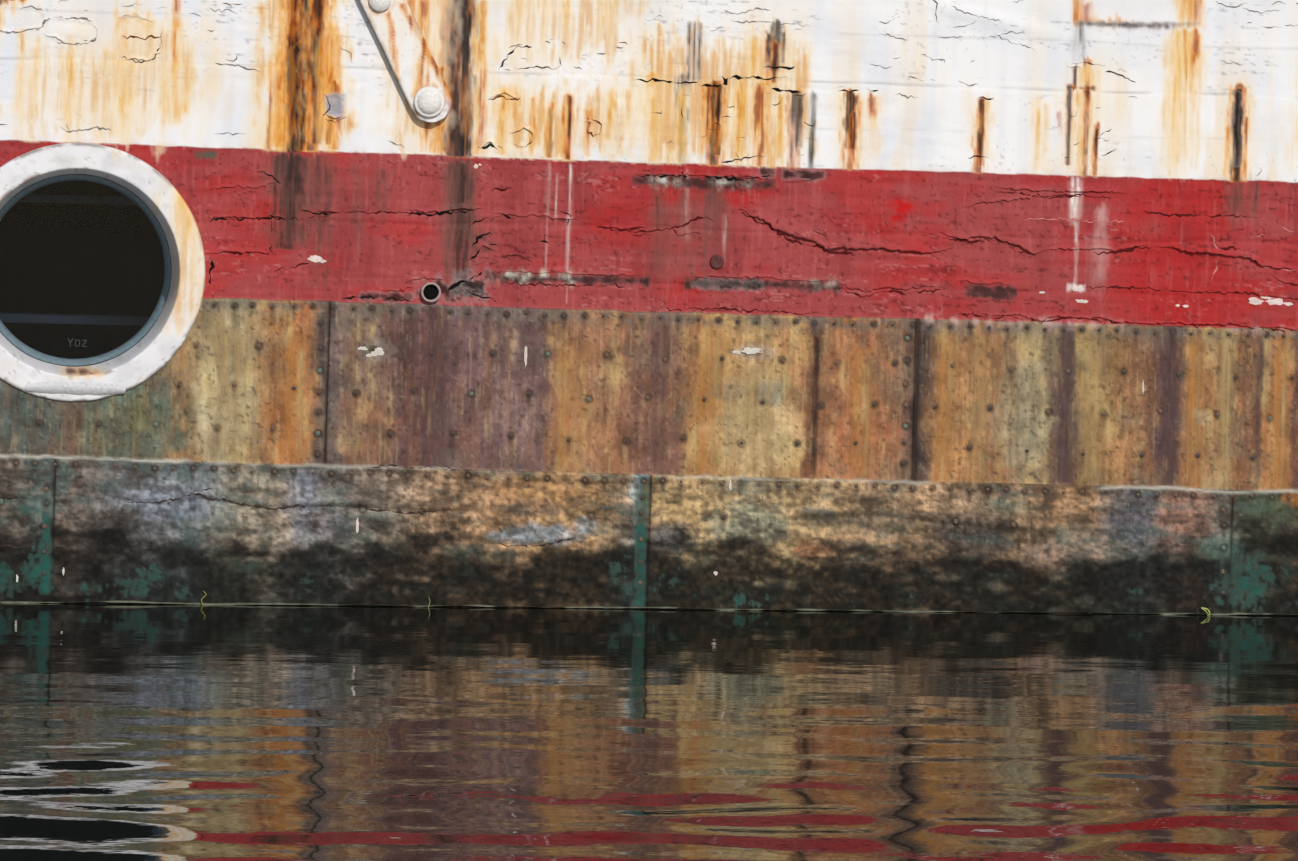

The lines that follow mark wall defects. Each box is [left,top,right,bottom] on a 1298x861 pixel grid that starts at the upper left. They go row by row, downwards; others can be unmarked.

peeling [0,0,169,63]
crack [499,39,627,71]
crack [638,66,816,163]
crack [840,0,1033,100]
rust [957,86,1003,175]
rust [1025,51,1112,179]
crack [1056,62,1135,158]
rust [1148,0,1298,185]
rust [0,0,890,478]
crack [1085,211,1297,299]
rust [918,330,1000,485]
damp [0,305,1298,615]